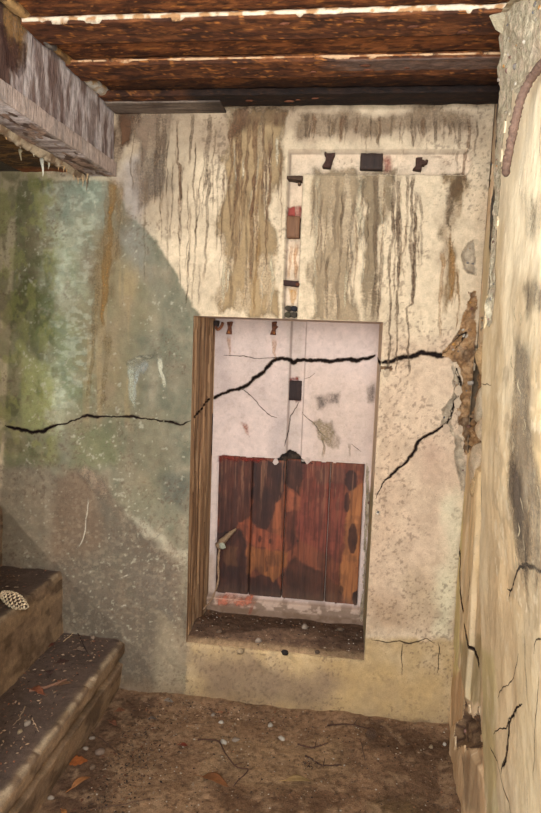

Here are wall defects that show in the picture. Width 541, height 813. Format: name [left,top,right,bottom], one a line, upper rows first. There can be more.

leakage [114,113,182,212]
leakage [189,106,288,318]
leakage [307,168,418,370]
leakage [297,105,479,180]
spalling [438,0,541,497]
corrosion [501,59,541,177]
crack [5,332,467,498]
crack [508,563,541,596]
spalling [454,700,483,752]
crack [490,657,539,813]